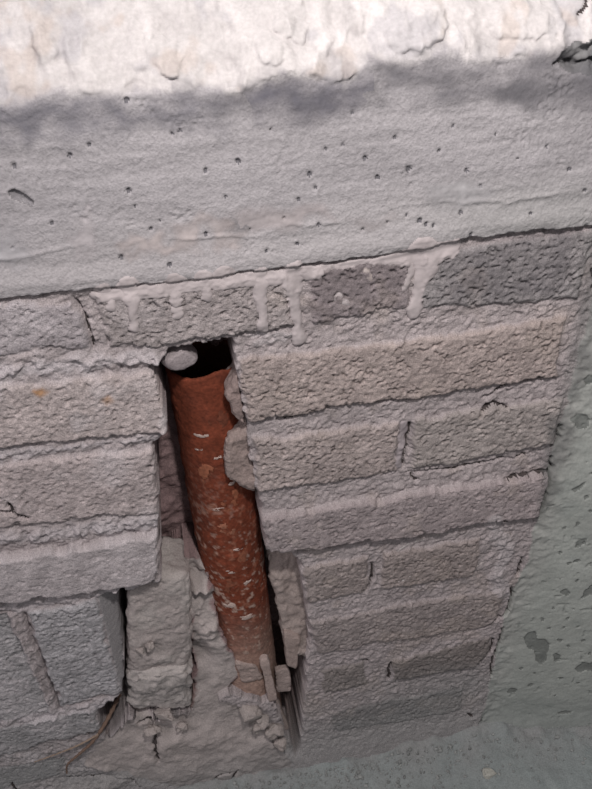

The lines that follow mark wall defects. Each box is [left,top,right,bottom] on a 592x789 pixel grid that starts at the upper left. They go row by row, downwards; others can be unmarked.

crack [481,384,507,411]
crack [401,422,417,480]
crack [436,452,552,481]
crack [2,502,29,518]
spalling [125,536,193,709]
crack [143,716,160,759]